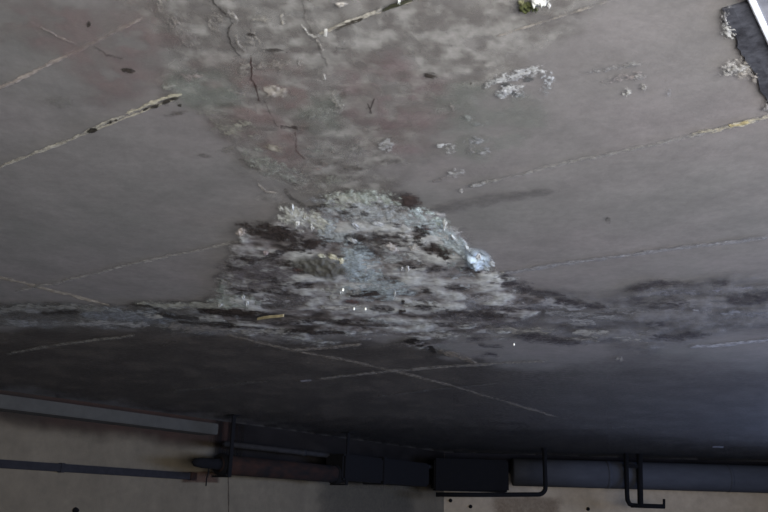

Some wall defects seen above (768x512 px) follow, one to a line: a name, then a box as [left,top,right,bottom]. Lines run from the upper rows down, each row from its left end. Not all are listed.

crack [213,0,305,159]
damp [0,0,579,207]
crack [280,14,327,51]
spalling [199,175,546,365]
damp [485,267,768,348]